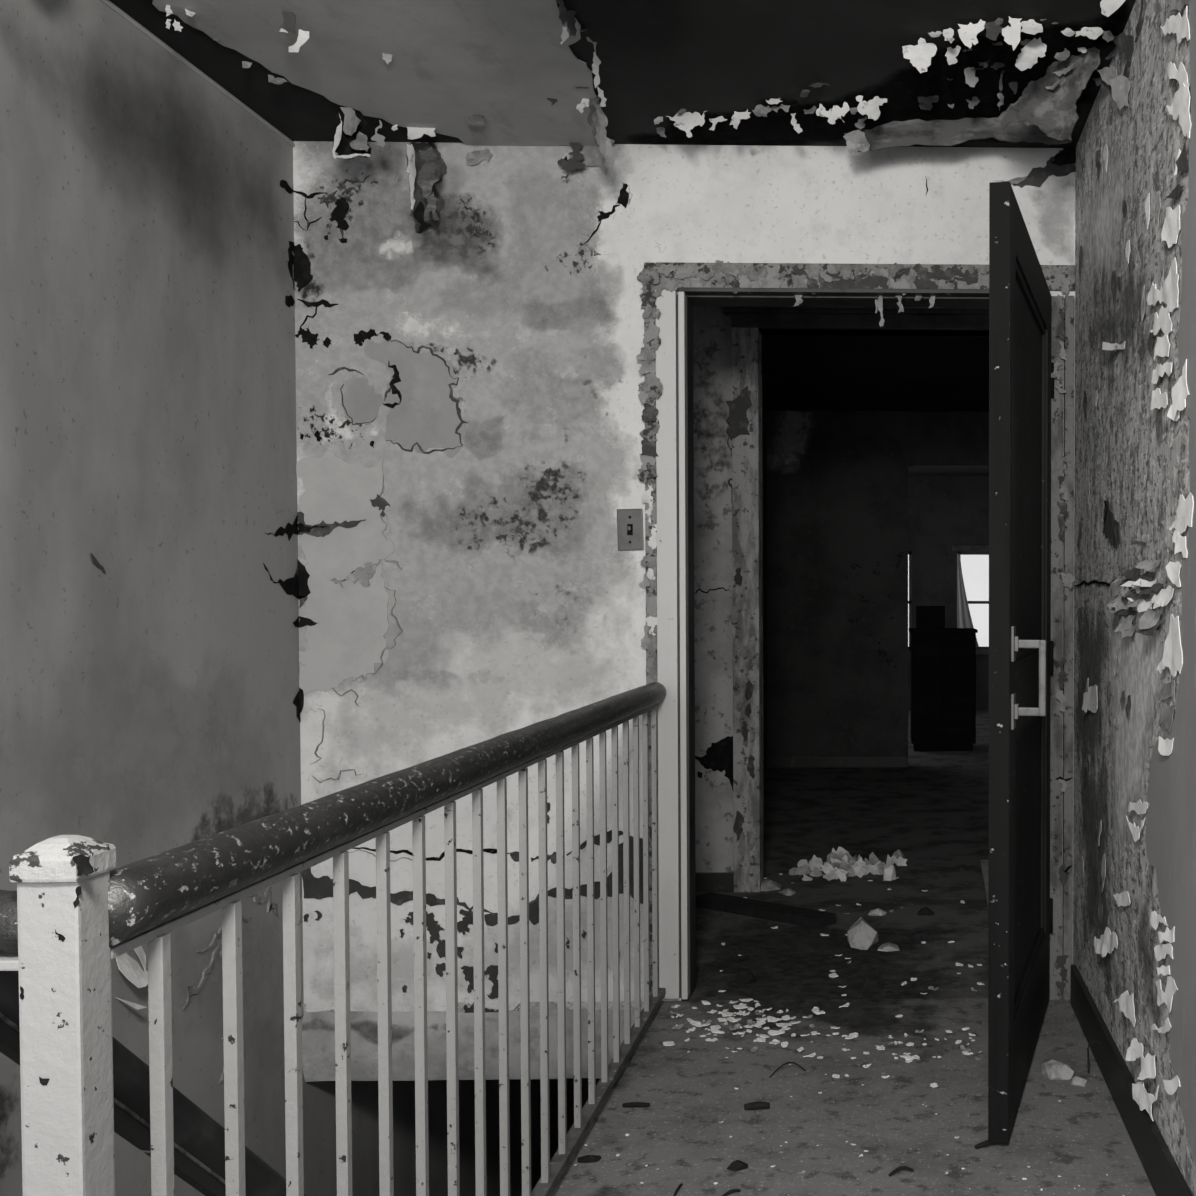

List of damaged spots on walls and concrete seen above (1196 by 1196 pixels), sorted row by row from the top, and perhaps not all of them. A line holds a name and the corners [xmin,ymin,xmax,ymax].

peeling [654,82,887,138]
leakage [631,8,1129,146]
flaking render [902,0,1146,206]
crack [581,183,632,246]
crack [383,361,402,408]
leakage [295,141,624,684]
crack [263,512,402,627]
peeling [293,329,468,783]
peeling [1082,0,1196,1165]
leakage [1076,612,1164,937]
flaking render [349,830,643,1013]
leakage [1138,904,1160,1024]